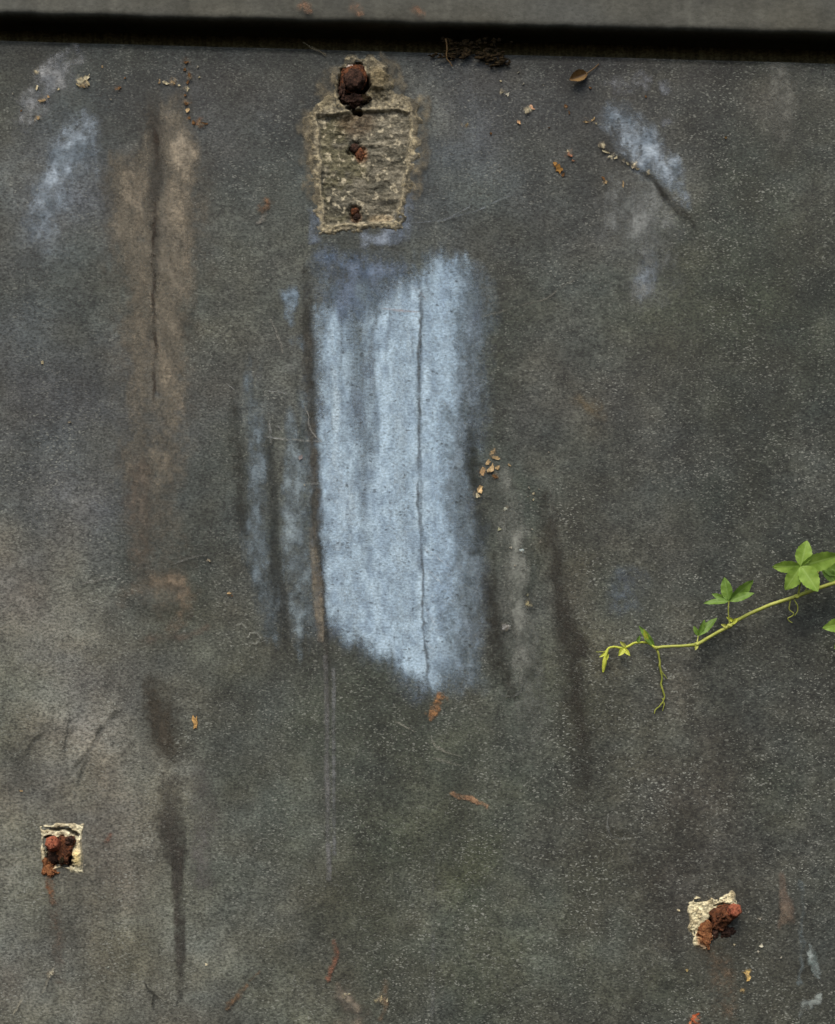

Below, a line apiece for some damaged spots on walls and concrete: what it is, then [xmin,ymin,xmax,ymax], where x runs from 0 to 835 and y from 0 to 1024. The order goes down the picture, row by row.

damp [21,55,69,119]
damp [35,118,94,229]
damp [105,95,198,426]
rust [338,82,372,109]
spalling [302,54,423,235]
crack [415,305,423,508]
damp [231,251,543,811]
crack [420,557,429,676]
damp [158,777,208,975]